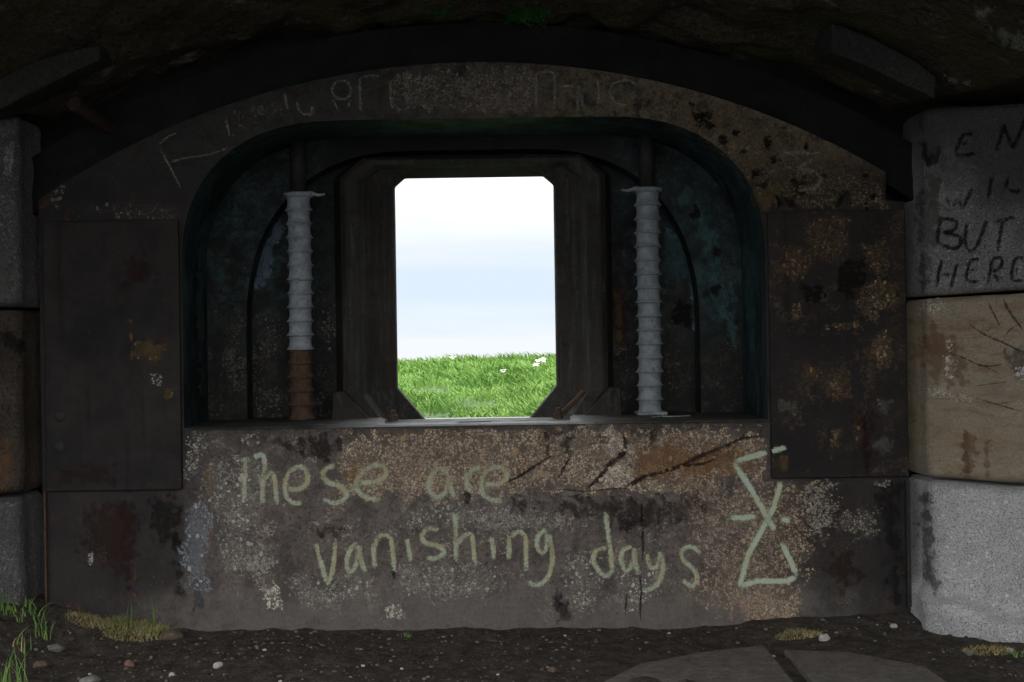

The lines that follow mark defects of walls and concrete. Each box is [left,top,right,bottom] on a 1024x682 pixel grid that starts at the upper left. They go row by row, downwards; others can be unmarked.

crack [947,300,1022,412]
crack [505,434,761,497]
corrosion [632,441,751,482]
water stain [913,492,941,590]